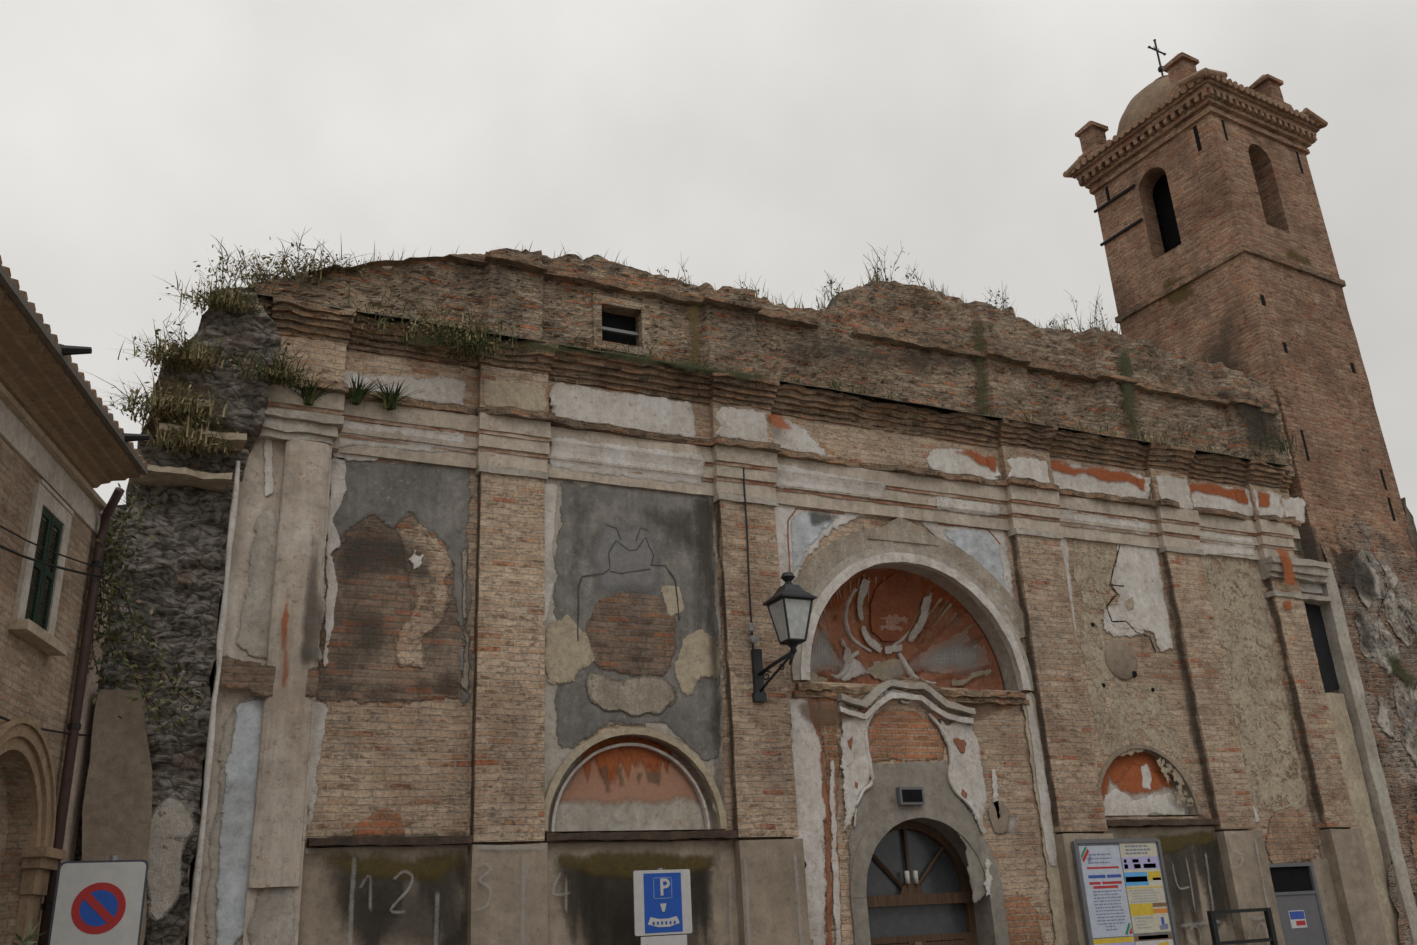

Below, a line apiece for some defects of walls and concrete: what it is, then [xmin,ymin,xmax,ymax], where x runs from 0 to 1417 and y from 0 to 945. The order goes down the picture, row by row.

flaking render [146,439,296,945]
flaking render [305,420,473,826]
damp [337,860,468,945]
flaking render [344,371,466,405]
damp [562,865,709,945]
flaking render [483,379,885,819]
flaking render [789,639,1069,945]
flaking render [920,496,1014,608]
flaking render [926,448,1306,524]
flaking render [1059,509,1194,817]
flaking render [1200,531,1307,823]